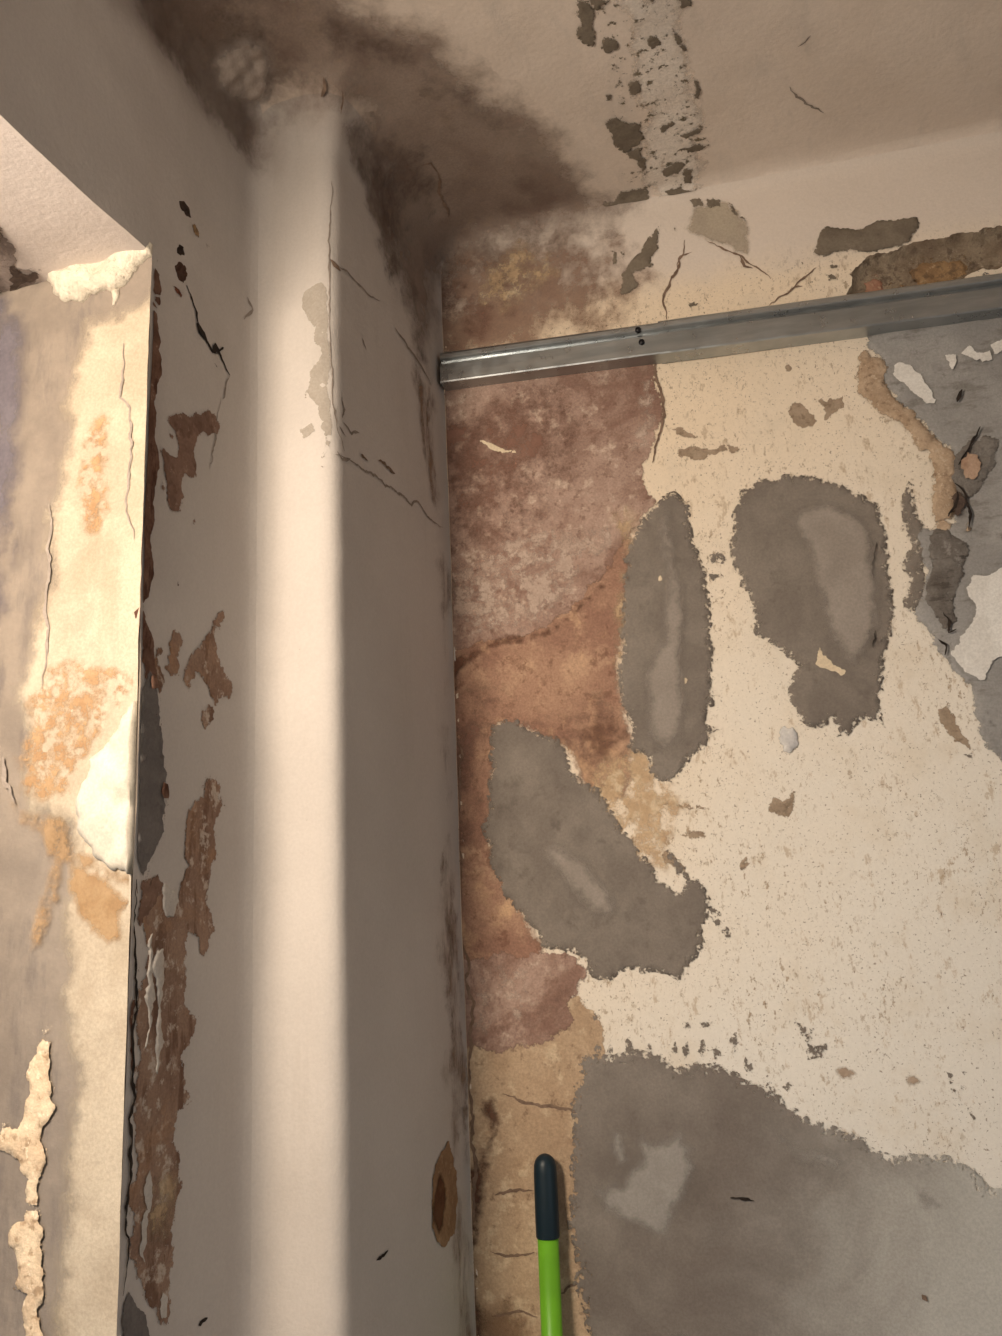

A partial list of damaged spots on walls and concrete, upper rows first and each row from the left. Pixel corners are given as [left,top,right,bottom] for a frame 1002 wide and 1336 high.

crack [186,285,230,464]
crack [244,299,253,320]
crack [328,181,449,527]
leakage [152,0,650,352]
peeling [445,364,739,650]
peeling [576,0,708,207]
crack [652,364,666,463]
crack [662,240,815,319]
flaking render [788,350,971,531]
flaking render [810,225,1002,295]
peeling [0,227,233,1336]
flaking render [466,996,651,1336]